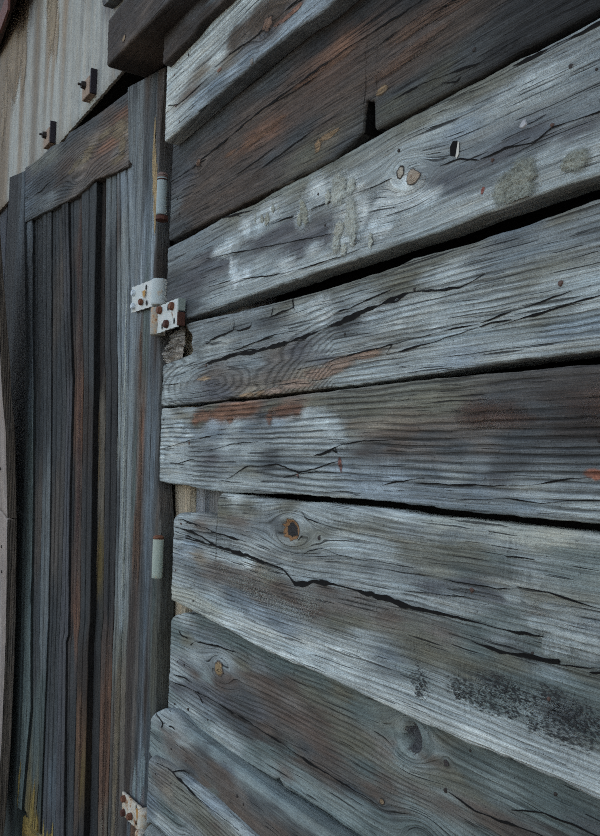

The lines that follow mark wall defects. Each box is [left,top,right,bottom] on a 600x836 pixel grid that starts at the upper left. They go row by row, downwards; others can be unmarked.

crack [166,273,485,385]
crack [297,291,600,370]
crack [175,513,600,674]
mould [407,662,432,700]
mould [445,665,600,755]